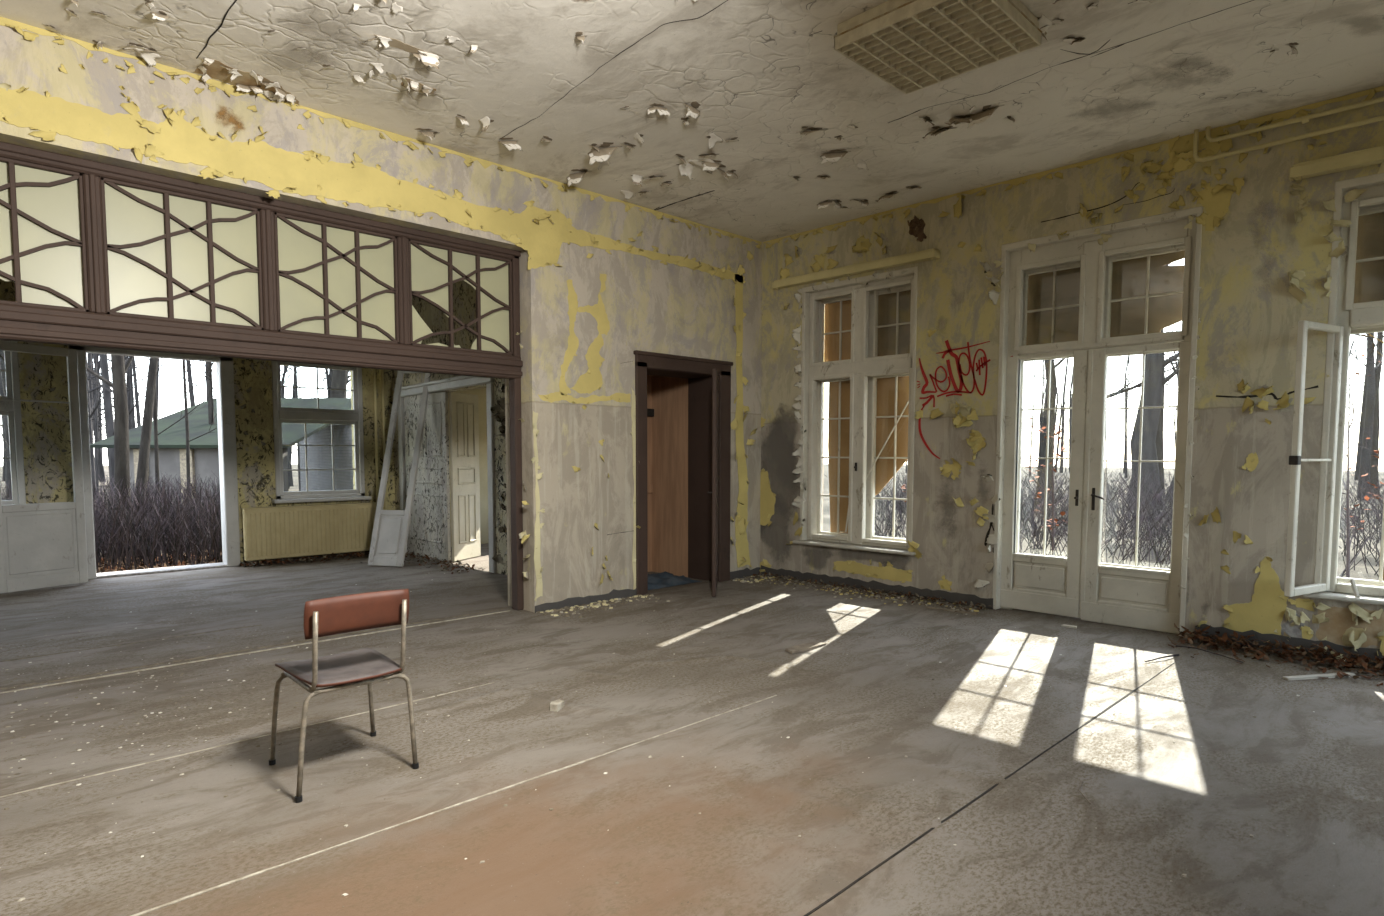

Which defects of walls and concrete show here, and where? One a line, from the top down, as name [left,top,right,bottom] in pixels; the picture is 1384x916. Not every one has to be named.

peeling [145,0,171,21]
crack [196,0,237,59]
spalling [383,0,403,17]
peeling [1037,0,1124,57]
peeling [0,16,1384,602]
water stain [760,414,908,570]